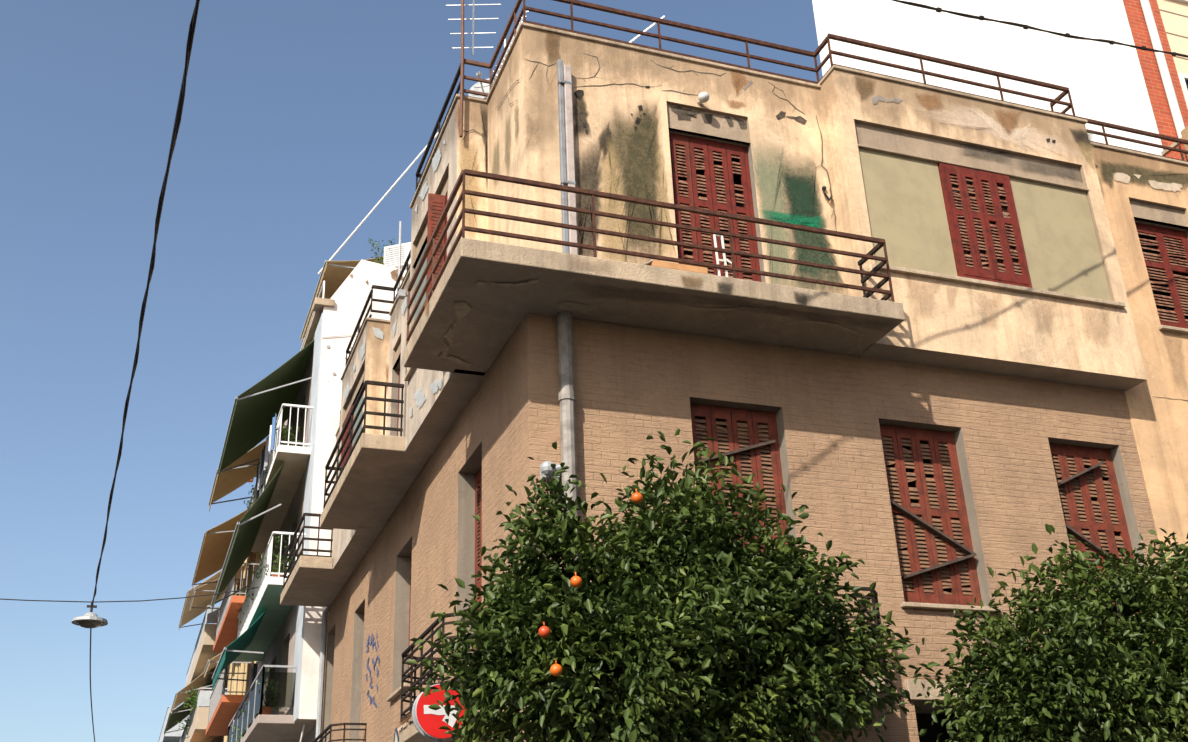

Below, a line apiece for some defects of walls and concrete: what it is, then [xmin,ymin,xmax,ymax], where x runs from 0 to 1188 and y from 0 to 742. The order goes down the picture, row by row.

crack [496,53,725,108]
water stain [574,97,672,257]
water stain [718,283,732,295]
water stain [756,160,841,305]